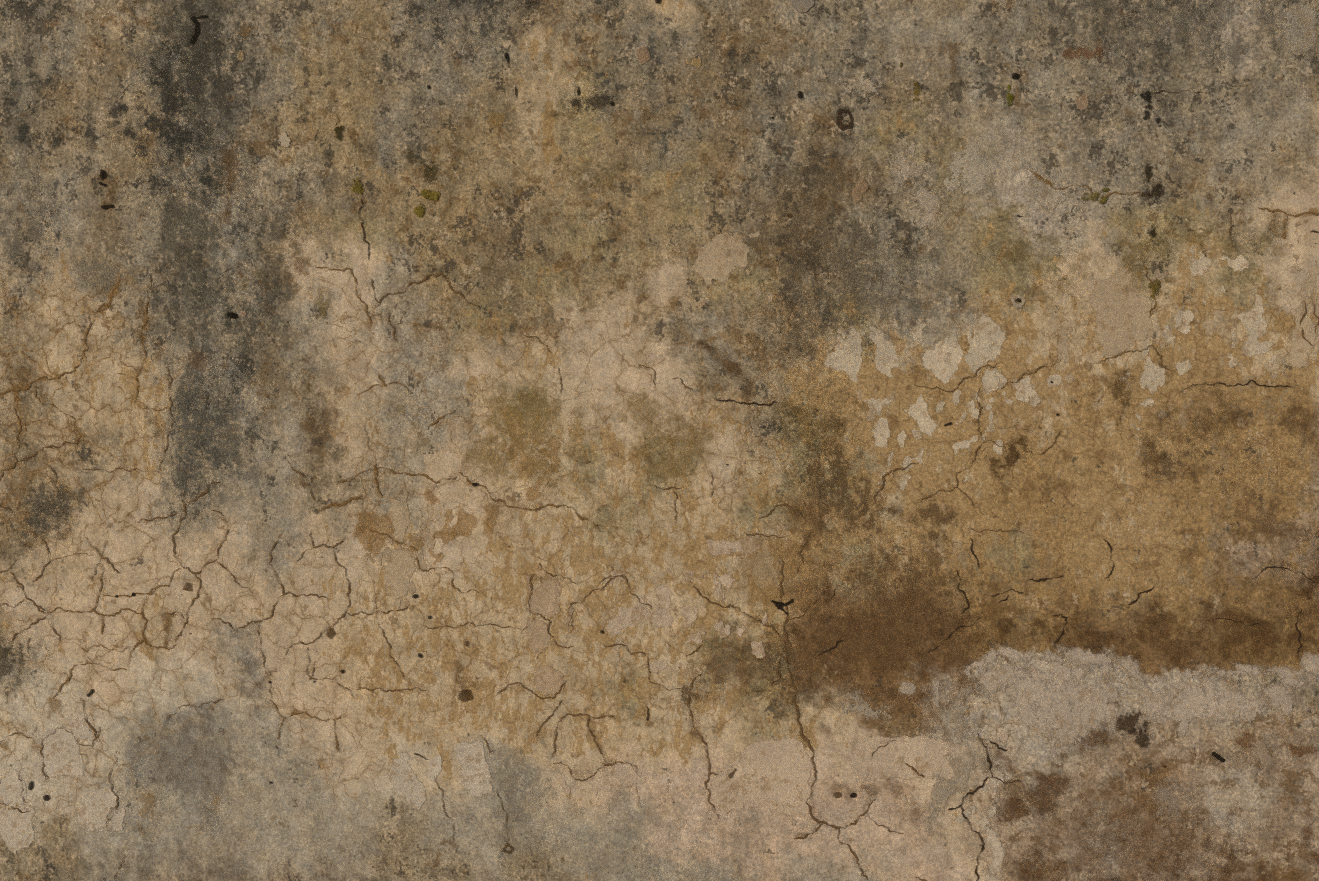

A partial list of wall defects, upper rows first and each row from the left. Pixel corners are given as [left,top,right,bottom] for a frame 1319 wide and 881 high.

damp [110,62,202,156]
damp [890,113,1069,228]
peeling [823,315,1062,495]
peeling [1119,342,1192,430]
peeling [1189,246,1250,276]
peeling [1227,244,1319,380]
crack [0,272,651,823]
damp [807,415,956,601]
crack [912,361,1063,653]
crack [693,503,902,880]
damp [964,602,1319,772]
crack [948,733,1021,881]